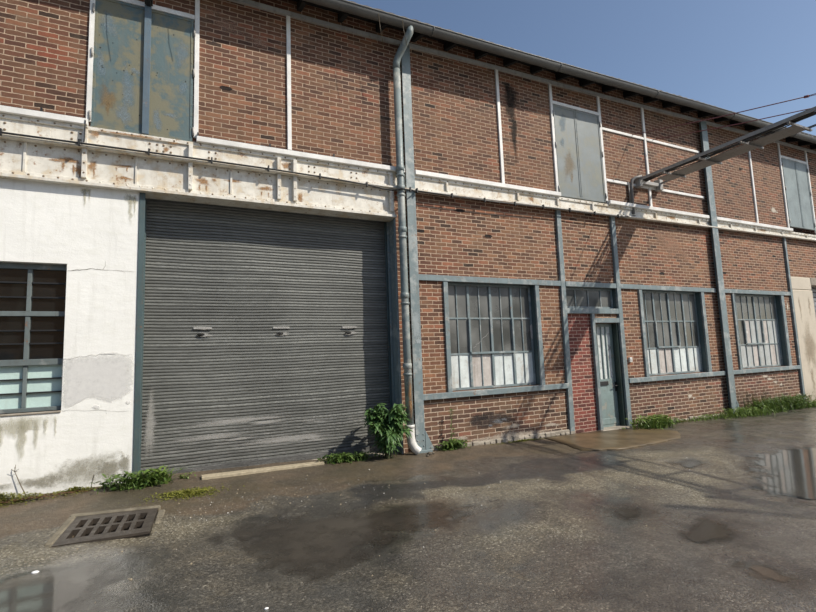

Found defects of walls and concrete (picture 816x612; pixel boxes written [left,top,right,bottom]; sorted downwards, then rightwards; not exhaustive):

rust [49,158,96,177]
water stain [0,420,56,447]
water stain [21,455,128,486]